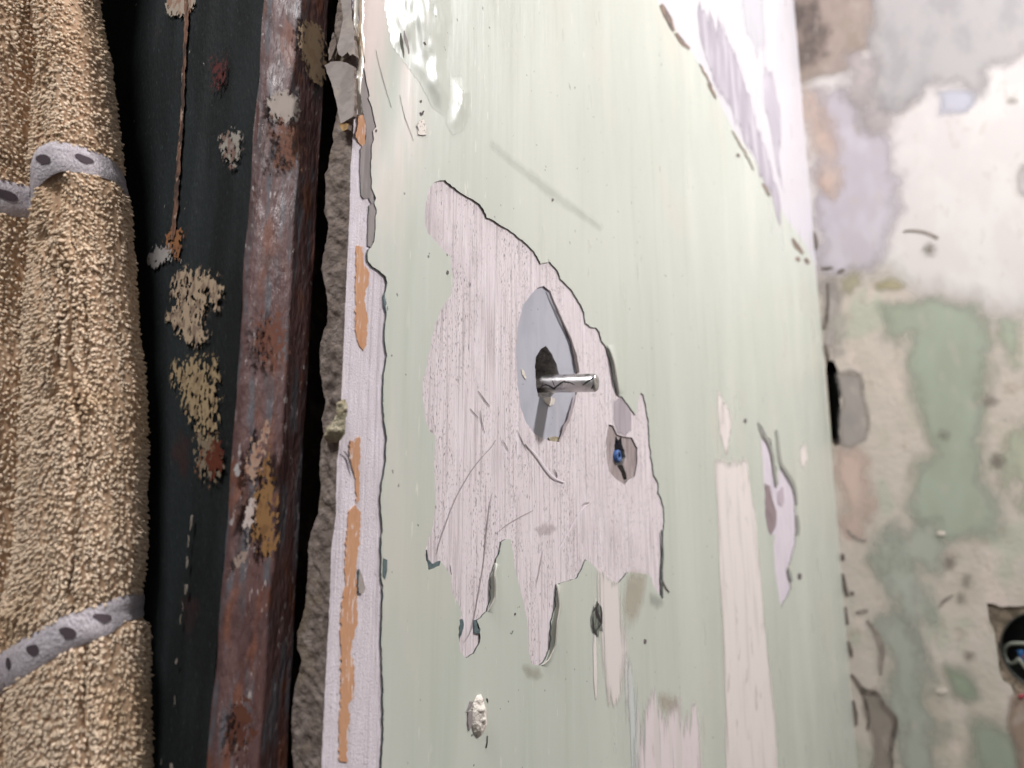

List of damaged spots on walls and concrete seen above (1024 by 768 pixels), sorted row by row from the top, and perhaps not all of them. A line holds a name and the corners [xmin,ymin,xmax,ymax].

rust [270,115,306,171]
peeling [417,100,427,136]
peeling [792,238,810,264]
peeling [147,243,271,568]
rust [247,445,280,560]
flaking render [291,0,386,768]
peeling [422,180,663,667]
peeling [744,419,802,605]
flaking render [987,603,1024,768]